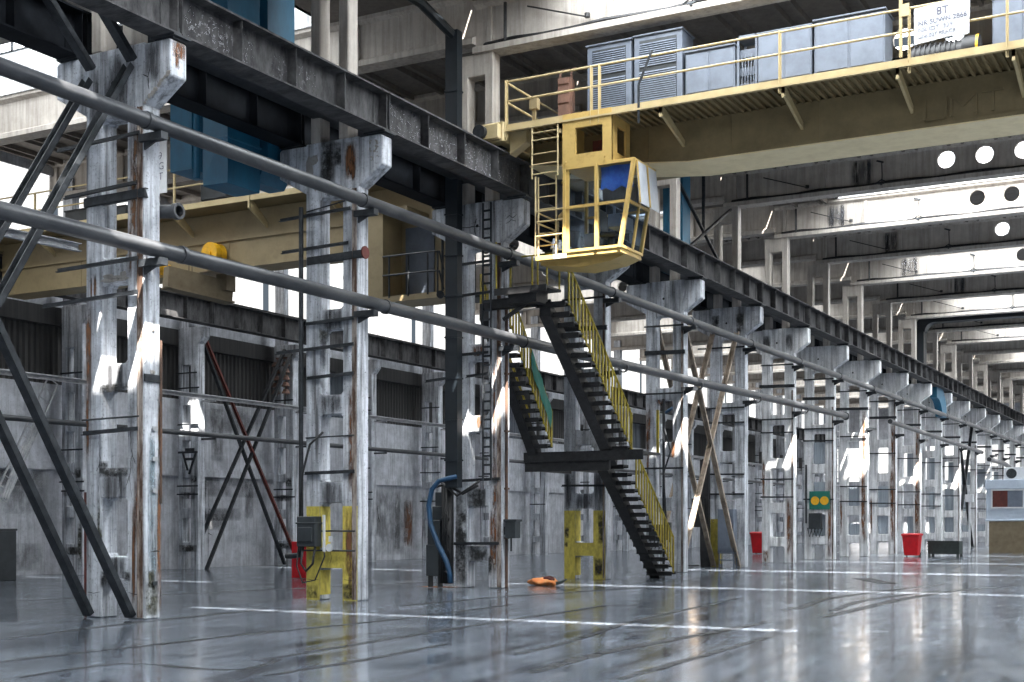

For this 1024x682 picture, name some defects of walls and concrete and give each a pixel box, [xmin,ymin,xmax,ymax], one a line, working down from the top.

corrosion [174,42,185,67]
corrosion [345,143,356,180]
corrosion [404,503,412,544]